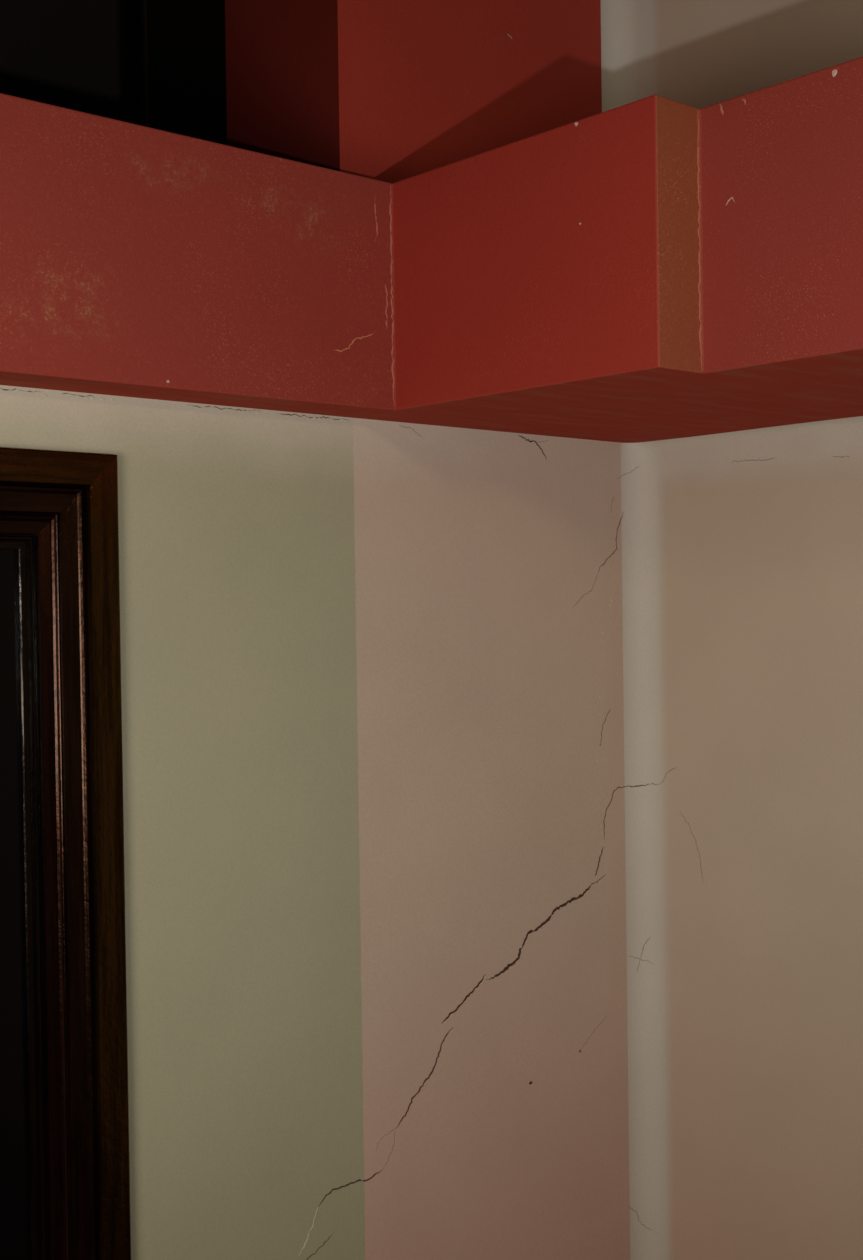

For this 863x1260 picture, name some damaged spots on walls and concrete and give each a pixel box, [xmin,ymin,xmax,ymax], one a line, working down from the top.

crack [573,466,640,608]
crack [299,768,675,1260]